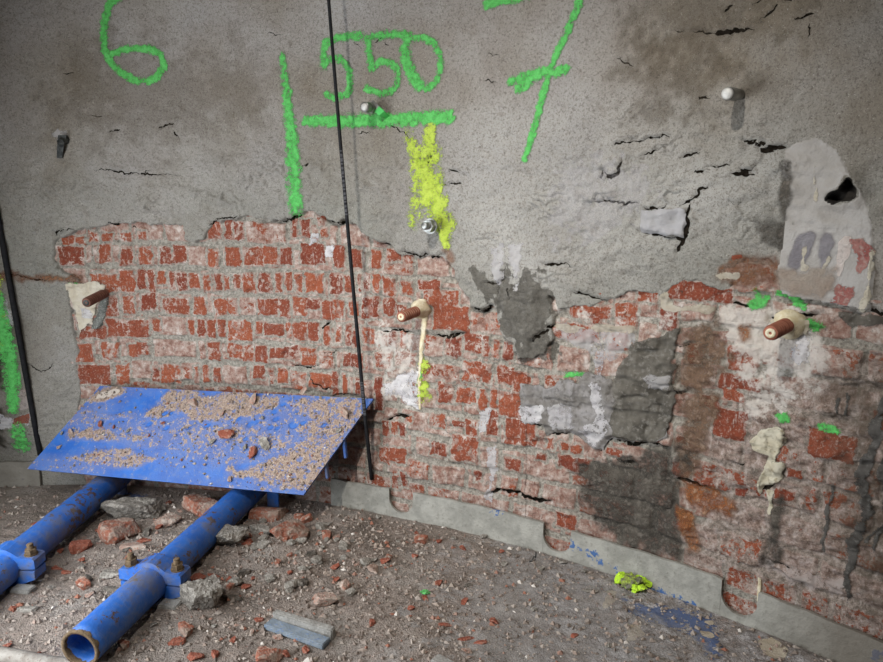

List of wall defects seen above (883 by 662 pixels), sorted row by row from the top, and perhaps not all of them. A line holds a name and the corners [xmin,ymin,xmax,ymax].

crack [675,0,814,37]
crack [96,168,178,176]
crack [589,134,786,252]
spalling [824,177,856,205]
spalling [55,211,883,641]
damp [758,397,883,601]